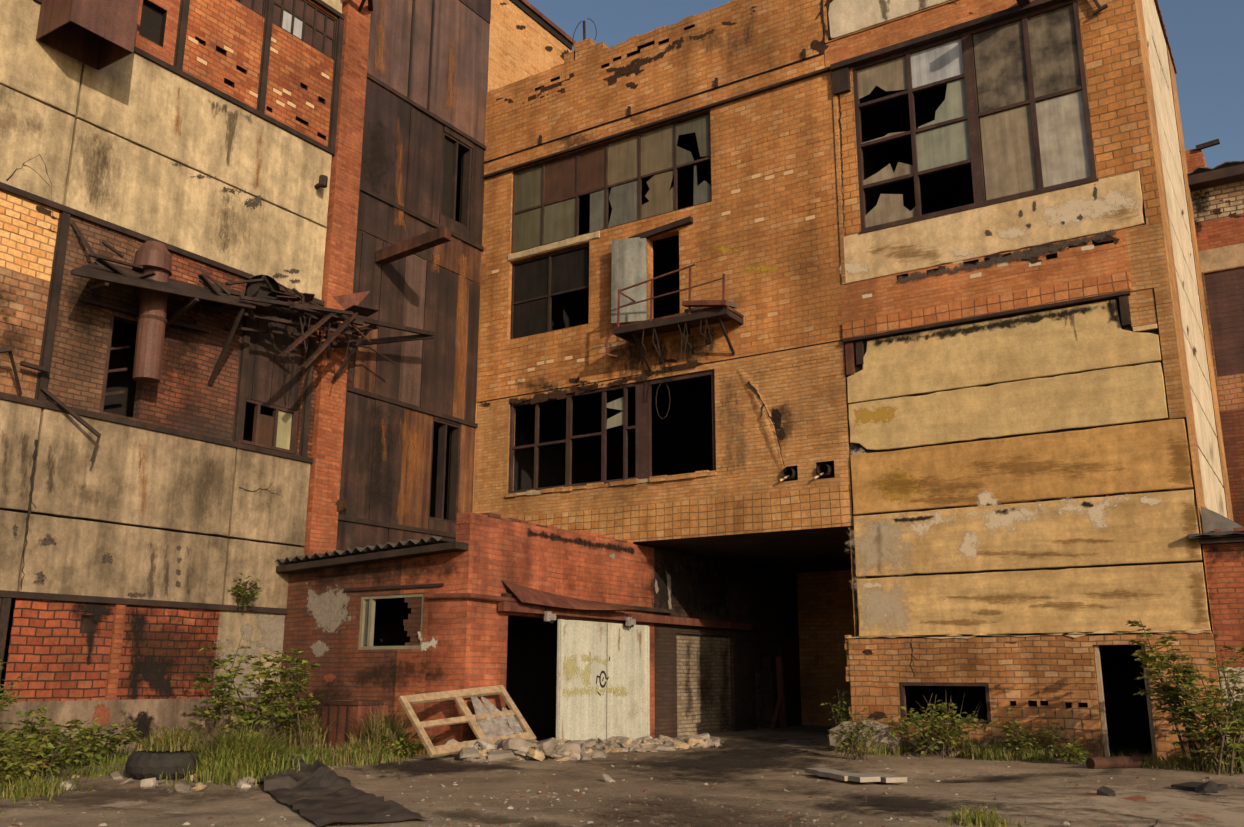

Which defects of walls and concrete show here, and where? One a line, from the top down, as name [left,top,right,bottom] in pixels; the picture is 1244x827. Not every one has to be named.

spalling [601,21,735,89]
spalling [496,73,574,104]
leakage [209,101,249,164]
peeling [895,184,1139,285]
leakage [1108,301,1118,322]
crack [747,381,786,470]
leakage [87,630,95,665]
leakage [134,656,177,699]
flaking render [305,581,352,657]
peeling [845,490,1162,714]
leakage [138,712,148,744]